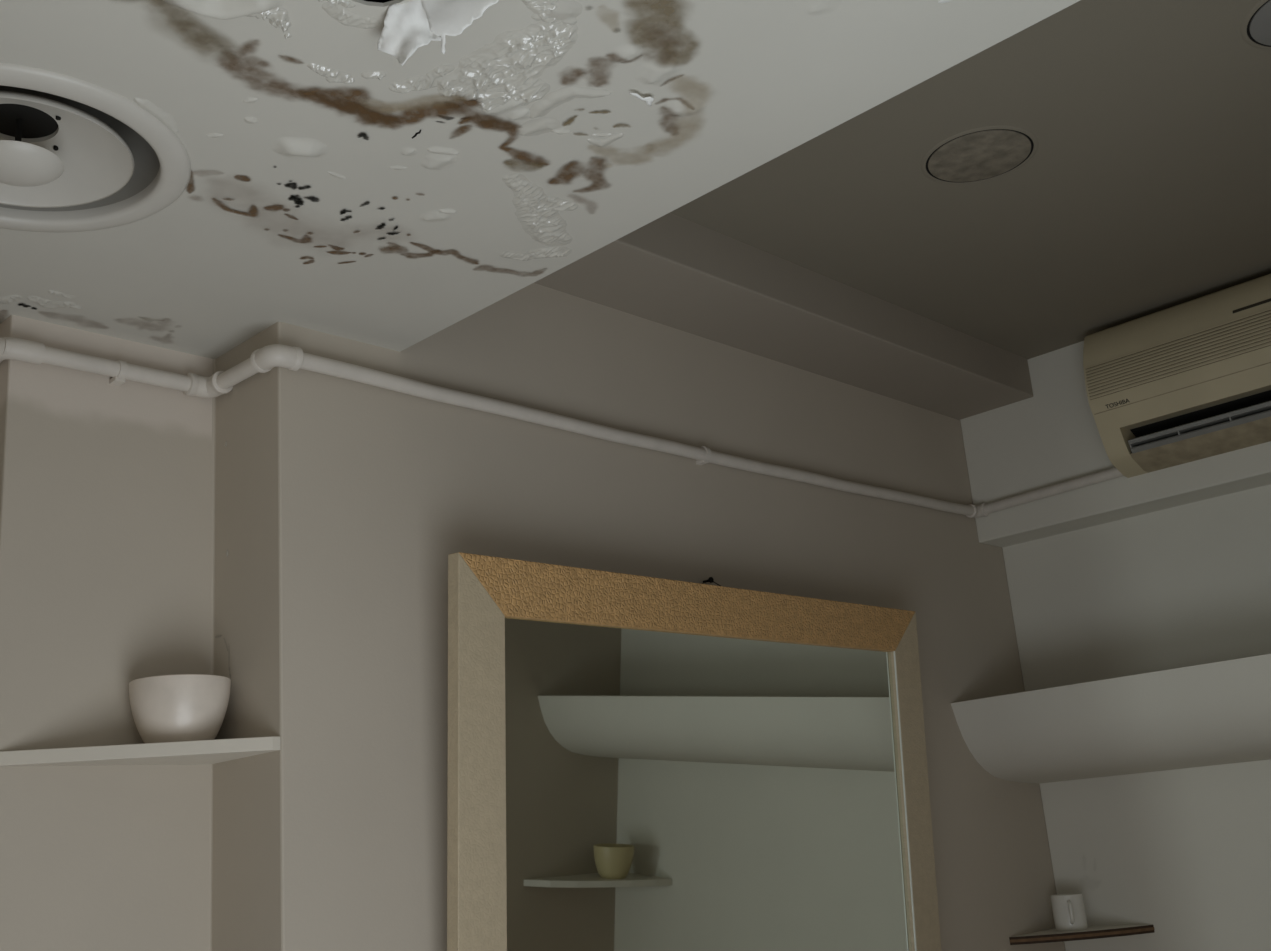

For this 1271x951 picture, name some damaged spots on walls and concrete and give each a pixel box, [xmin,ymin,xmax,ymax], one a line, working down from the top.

peeling [377,0,499,66]
leakage [616,0,696,64]
leakage [224,44,604,192]
leakage [213,181,478,264]